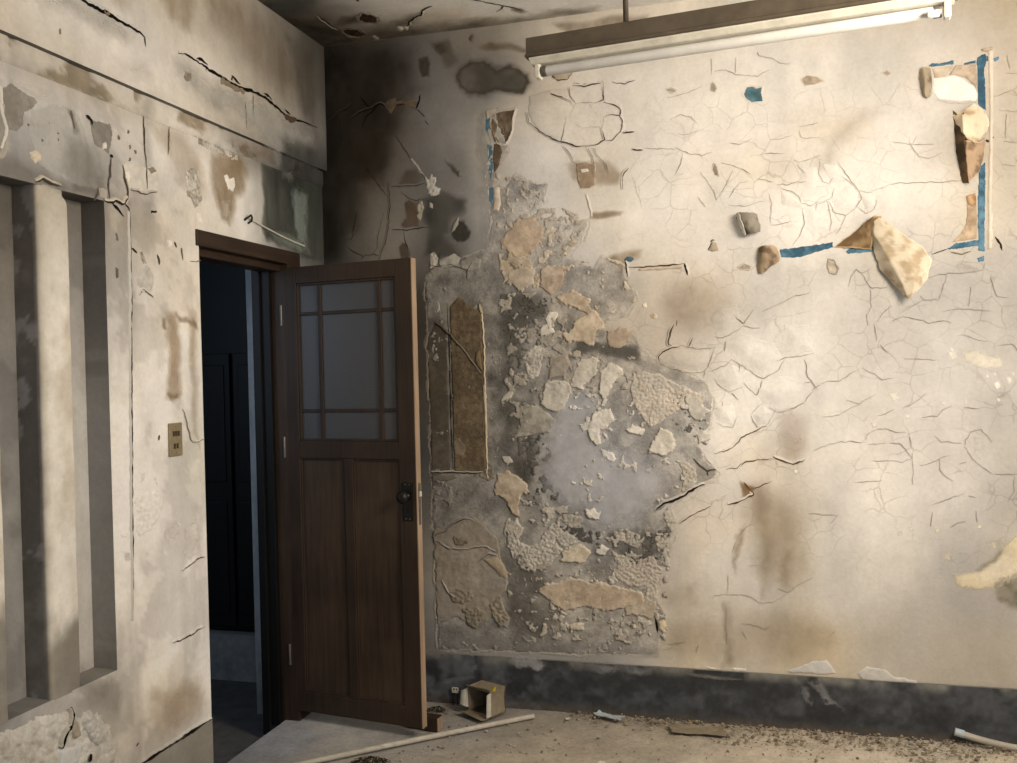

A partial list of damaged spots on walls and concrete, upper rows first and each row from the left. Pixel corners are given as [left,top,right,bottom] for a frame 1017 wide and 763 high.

crack [82,0,146,46]
spalling [0,83,37,160]
crack [34,175,62,187]
spalling [185,168,202,208]
crack [179,51,428,260]
water stain [410,158,470,269]
water stain [456,61,530,95]
crack [620,54,962,242]
peeling [932,64,977,104]
spalling [422,107,722,660]
crack [654,264,1017,527]
spalling [0,707,118,763]